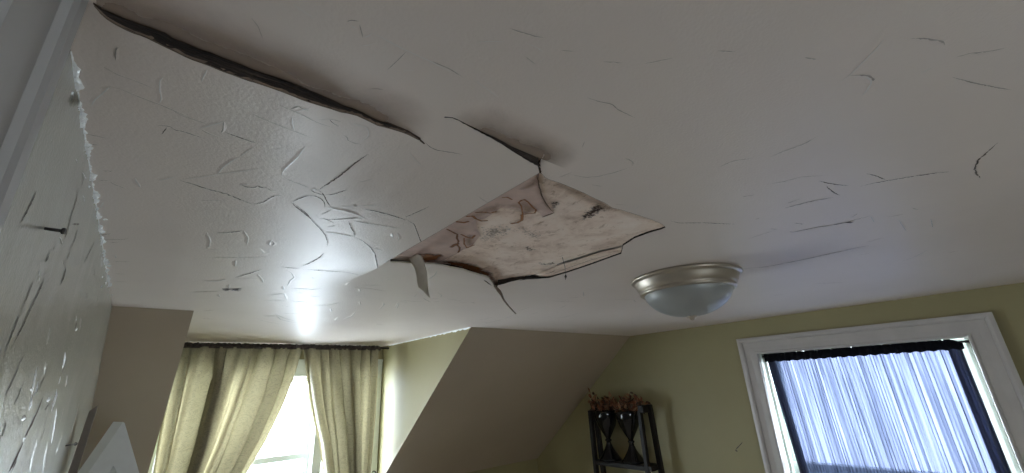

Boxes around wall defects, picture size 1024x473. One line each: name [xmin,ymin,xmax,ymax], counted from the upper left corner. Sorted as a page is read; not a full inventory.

crack [93,3,459,154]
crack [444,117,544,174]
crack [20,191,36,223]
crack [180,154,368,278]
crack [366,207,428,242]
flaking render [424,158,664,289]
crack [786,143,997,232]
crack [5,277,45,351]
crack [8,398,43,473]